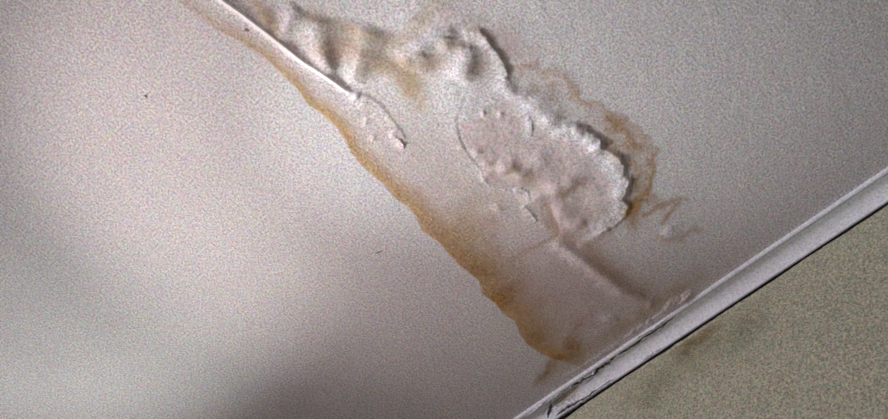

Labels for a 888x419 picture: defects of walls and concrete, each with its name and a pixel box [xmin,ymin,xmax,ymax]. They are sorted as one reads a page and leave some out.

peeling [310,84,419,178]
damp [289,78,579,380]
damp [626,197,641,216]